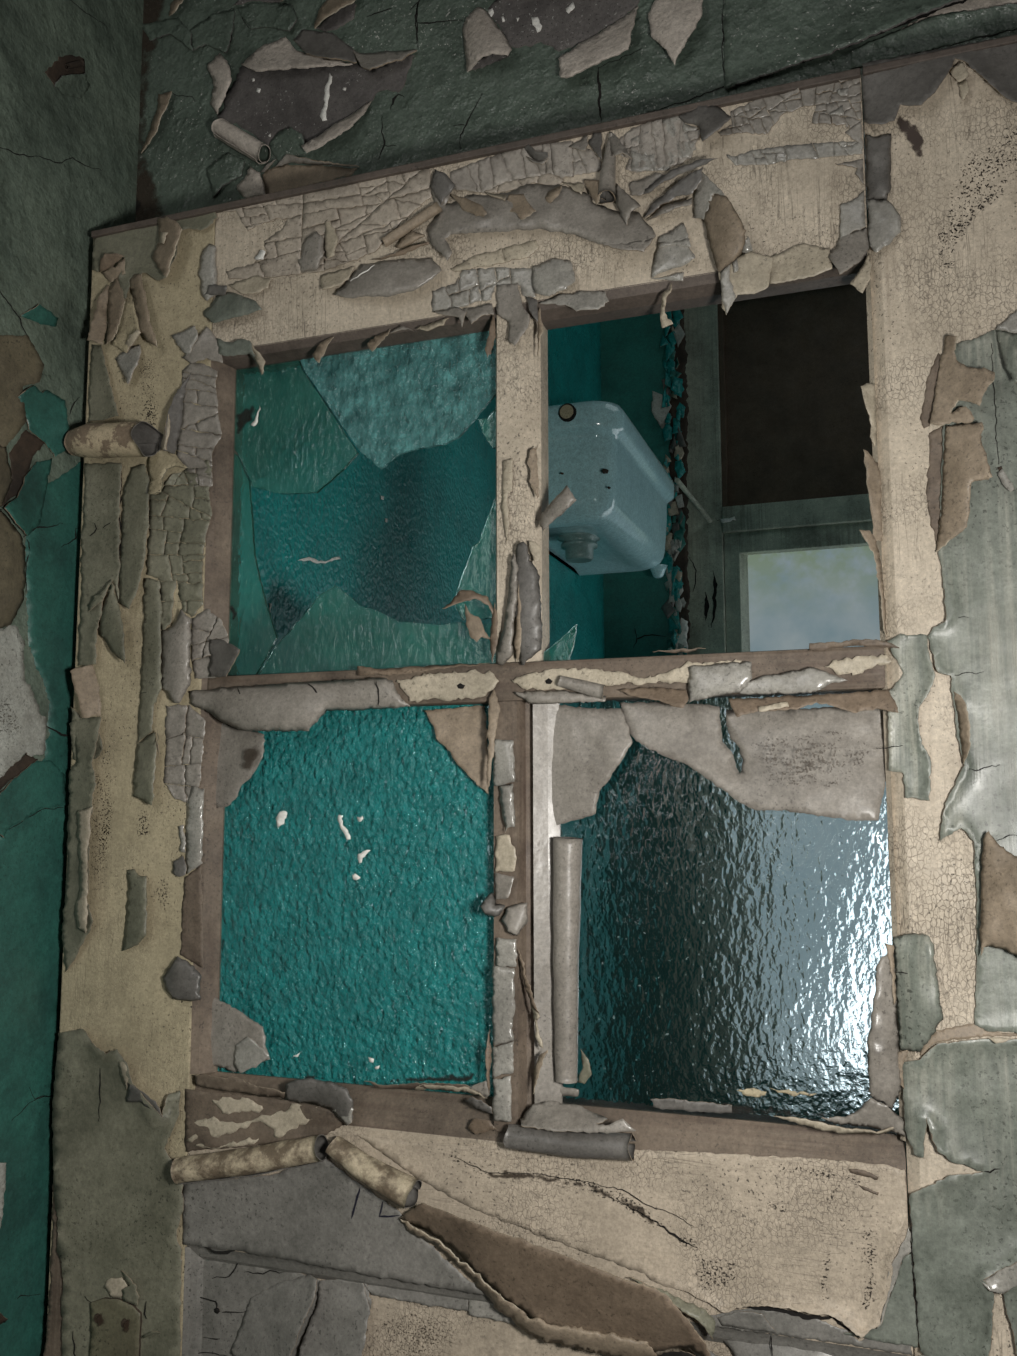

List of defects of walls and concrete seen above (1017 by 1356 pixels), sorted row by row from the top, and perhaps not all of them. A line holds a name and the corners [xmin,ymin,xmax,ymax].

peeling [141,91,172,153]
spalling [207,0,417,198]
spalling [462,0,703,79]
crack [210,0,967,294]
peeling [722,0,1017,125]
peeling [87,212,218,423]
peeling [198,244,262,323]
peeling [320,105,872,655]
peeling [0,311,1017,1356]
crack [205,1246,236,1254]
crack [428,1147,877,1339]
crack [748,1164,919,1336]